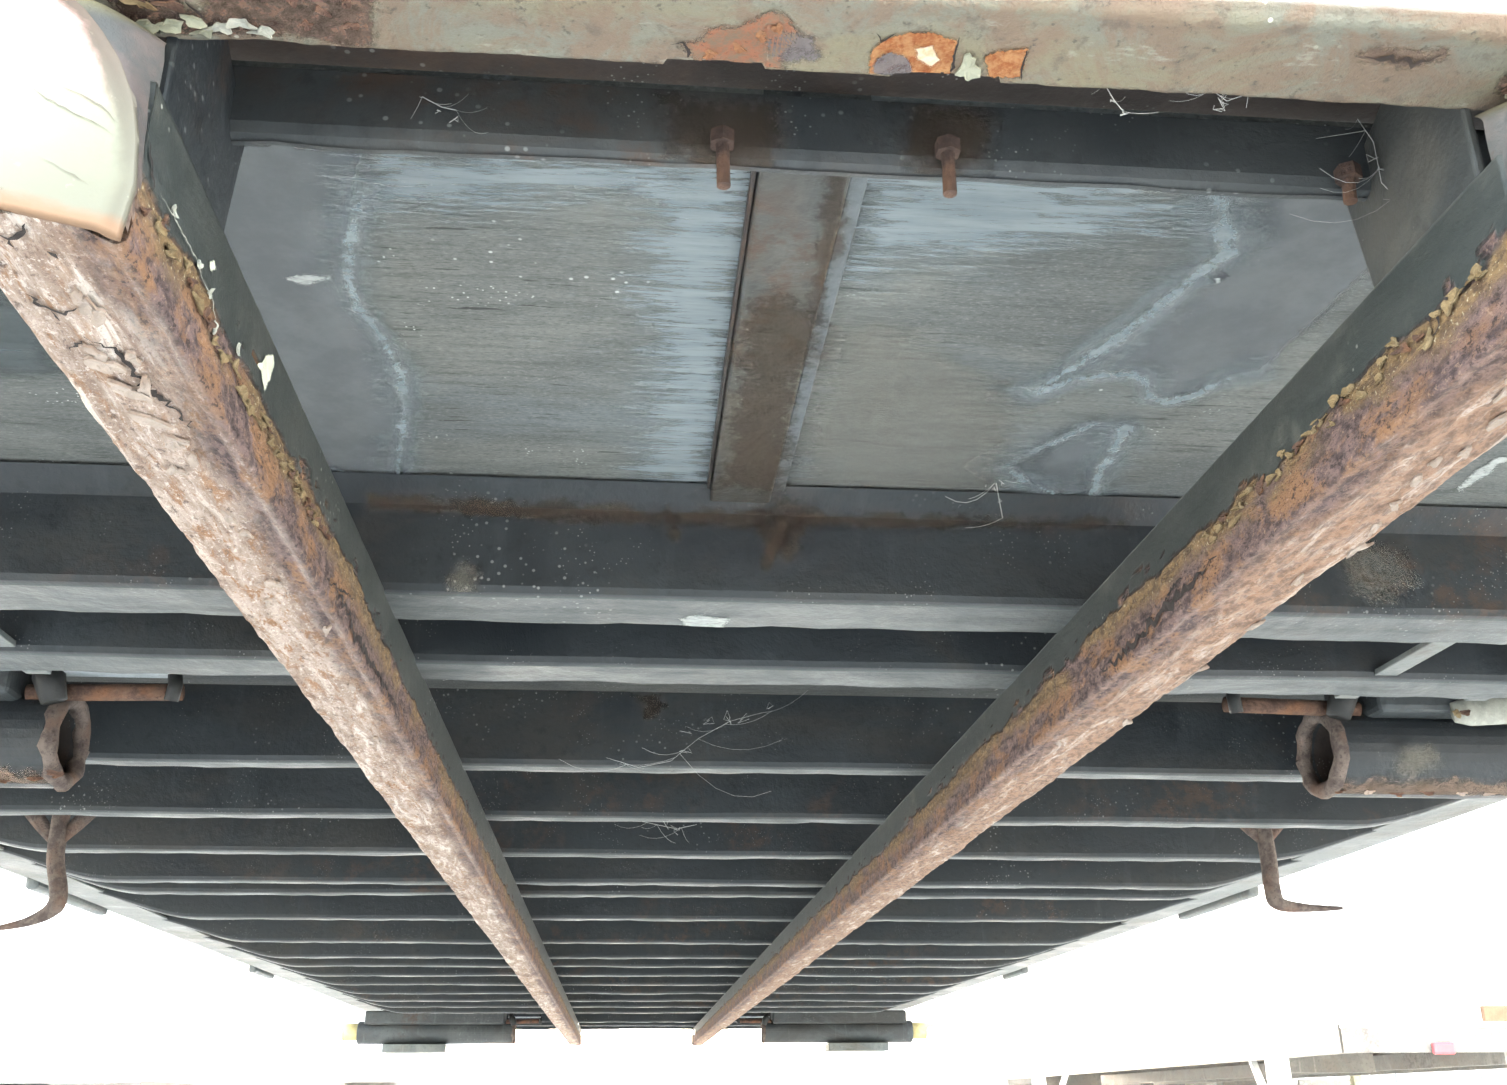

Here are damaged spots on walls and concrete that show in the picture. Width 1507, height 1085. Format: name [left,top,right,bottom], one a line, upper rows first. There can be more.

peeling [129,9,283,39]
peeling [955,52,981,81]
damp [841,178,1368,405]
damp [224,145,754,484]
corrosion [713,176,847,492]
damp [800,326,1136,496]
corrosion [791,511,1125,530]
corrosion [0,766,64,784]
corrosion [1335,775,1507,797]